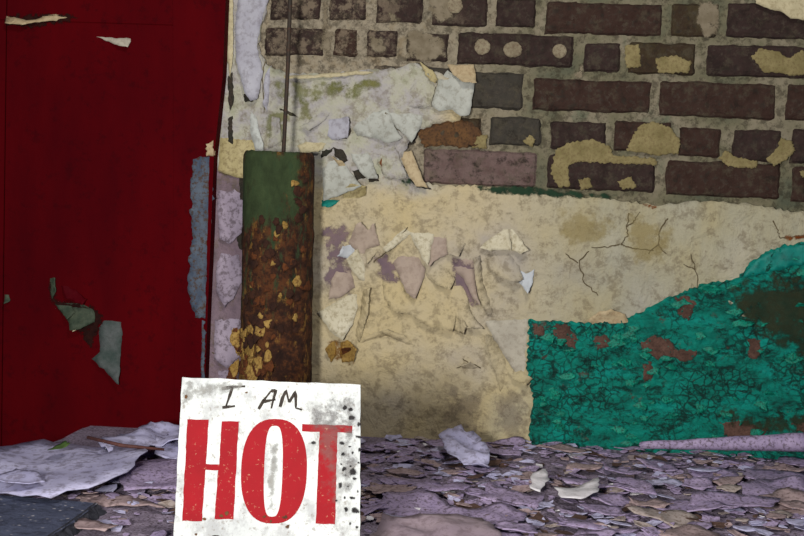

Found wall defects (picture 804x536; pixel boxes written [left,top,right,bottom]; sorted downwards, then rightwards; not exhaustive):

flaking render [755,0,804,20]
peeling [503,41,522,58]
peeling [552,44,567,59]
peeling [655,55,692,74]
peeling [751,48,804,76]
peeling [187,0,490,379]
peeling [551,121,681,191]
peeling [718,138,796,169]
crack [566,212,668,295]
peeling [49,278,123,385]
corrosion [226,312,274,381]
peeling [317,222,804,536]